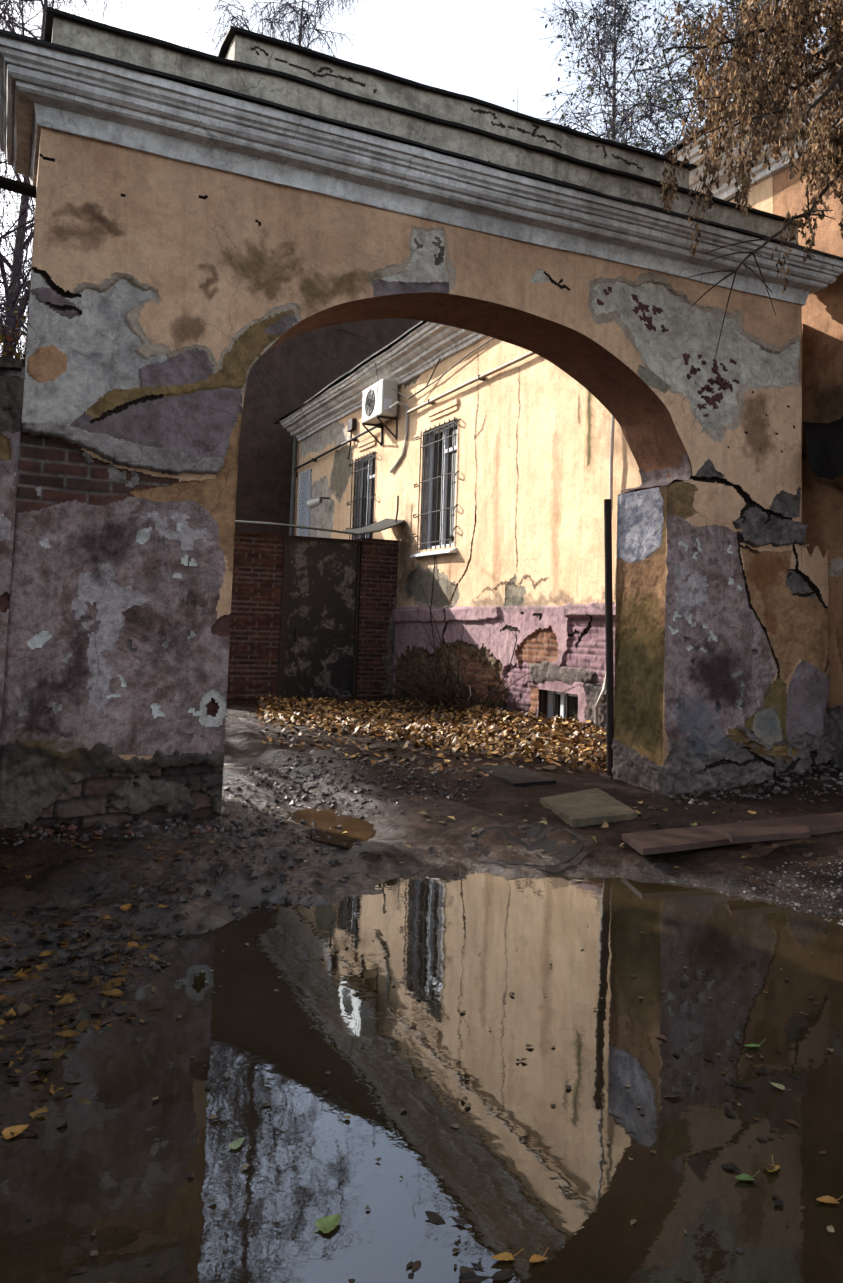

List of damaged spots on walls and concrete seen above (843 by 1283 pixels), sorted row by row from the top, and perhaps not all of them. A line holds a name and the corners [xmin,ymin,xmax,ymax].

crack [251,46,377,94]
crack [32,267,82,315]
spalling [367,226,456,297]
spalling [587,272,801,448]
peeling [0,270,303,829]
spalling [298,421,353,538]
peeling [453,454,843,795]
crack [690,476,828,679]